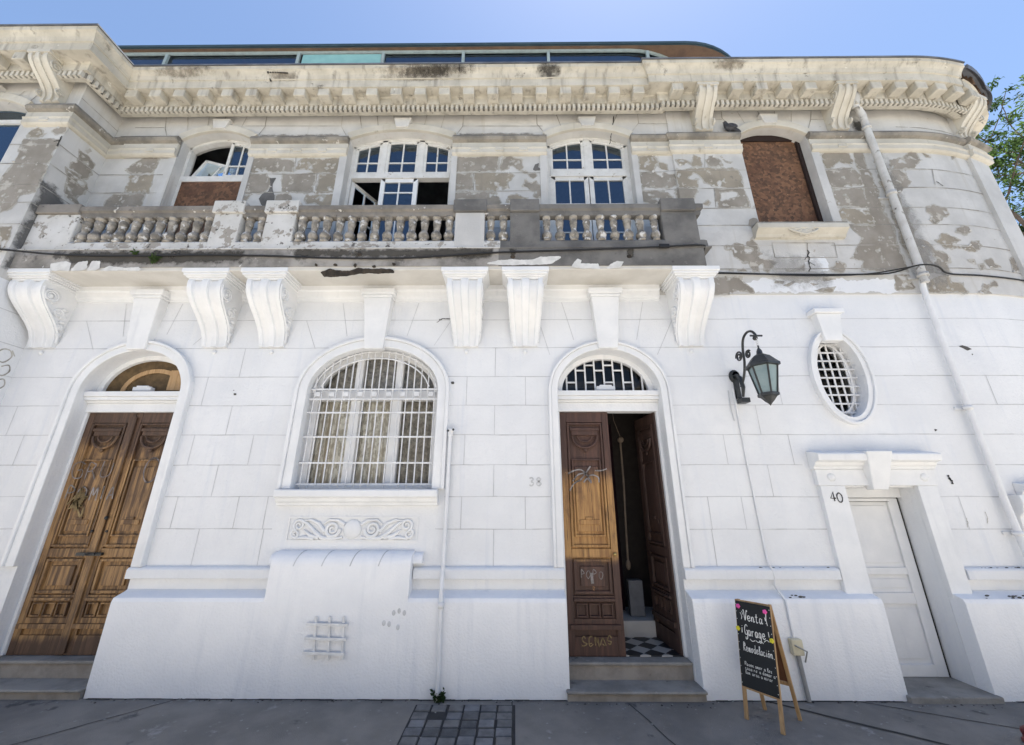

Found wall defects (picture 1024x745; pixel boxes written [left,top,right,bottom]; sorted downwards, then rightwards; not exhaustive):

peeling [0,126,68,213]
peeling [64,148,96,204]
peeling [103,158,161,206]
peeling [243,157,339,206]
peeling [455,156,541,204]
peeling [0,225,12,252]
peeling [638,155,805,295]
peeling [820,152,1019,294]
spalling [315,252,396,277]
peeling [810,283,836,293]